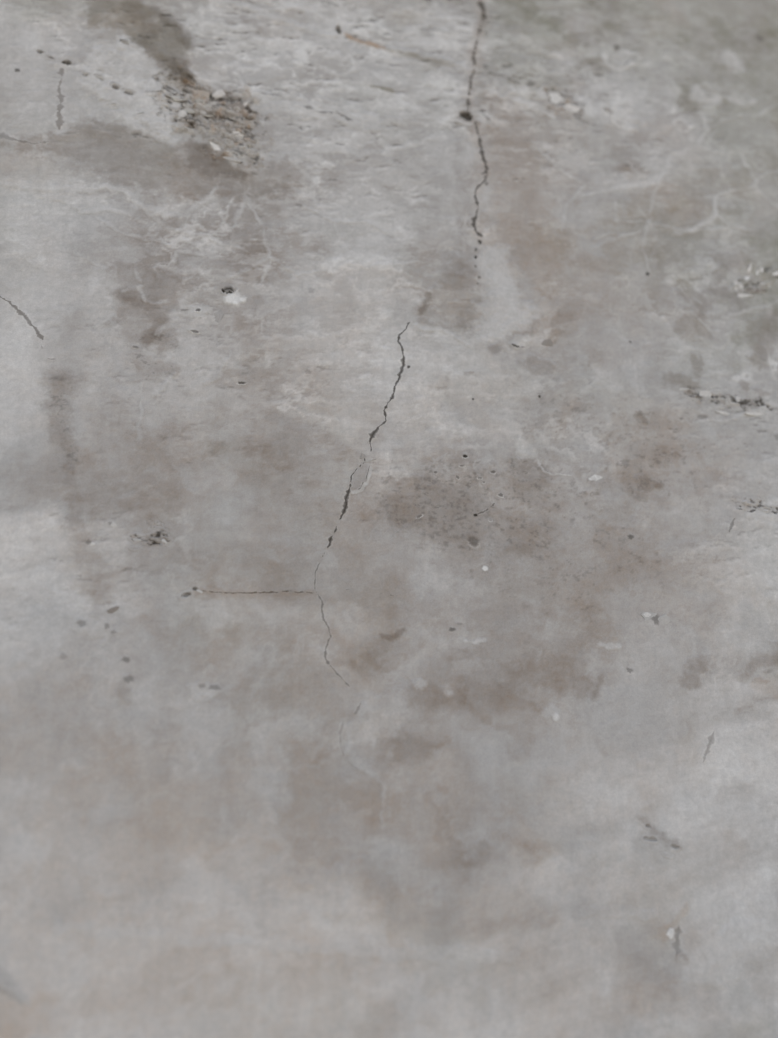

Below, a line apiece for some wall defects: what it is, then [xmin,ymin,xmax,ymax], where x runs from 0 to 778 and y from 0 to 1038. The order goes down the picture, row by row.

water stain [75,0,200,80]
spalling [32,47,282,175]
crack [458,0,540,286]
spalling [727,257,778,302]
crack [0,294,56,362]
spalling [680,384,778,417]
crack [177,321,411,771]
water stain [371,451,561,570]
spalling [726,495,778,529]